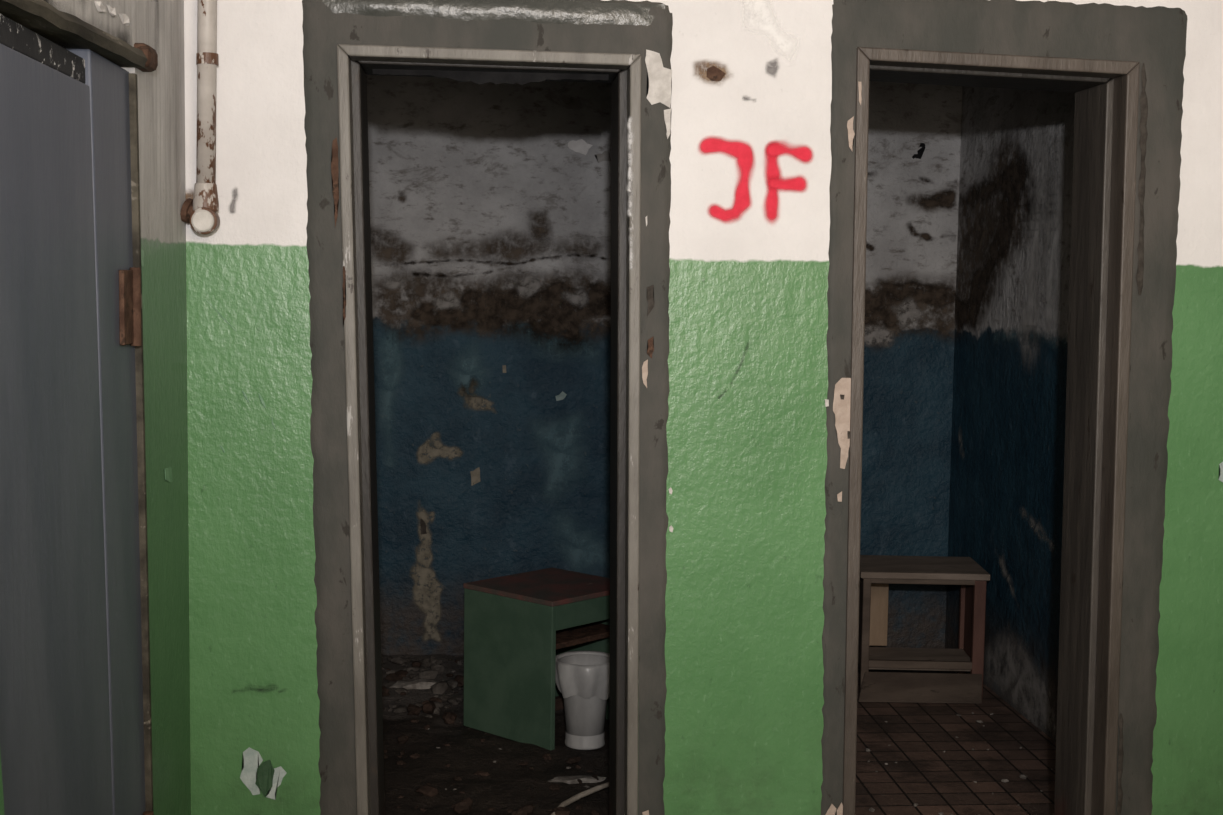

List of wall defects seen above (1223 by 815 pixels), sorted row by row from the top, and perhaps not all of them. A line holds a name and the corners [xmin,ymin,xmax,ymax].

peeling [645,50,672,139]
corrosion [695,62,727,83]
corrosion [180,192,194,223]
water stain [370,229,411,265]
water stain [434,213,600,261]
peeling [825,378,851,469]
peeling [411,509,442,641]
peeling [240,747,287,800]
peeling [825,802,843,815]